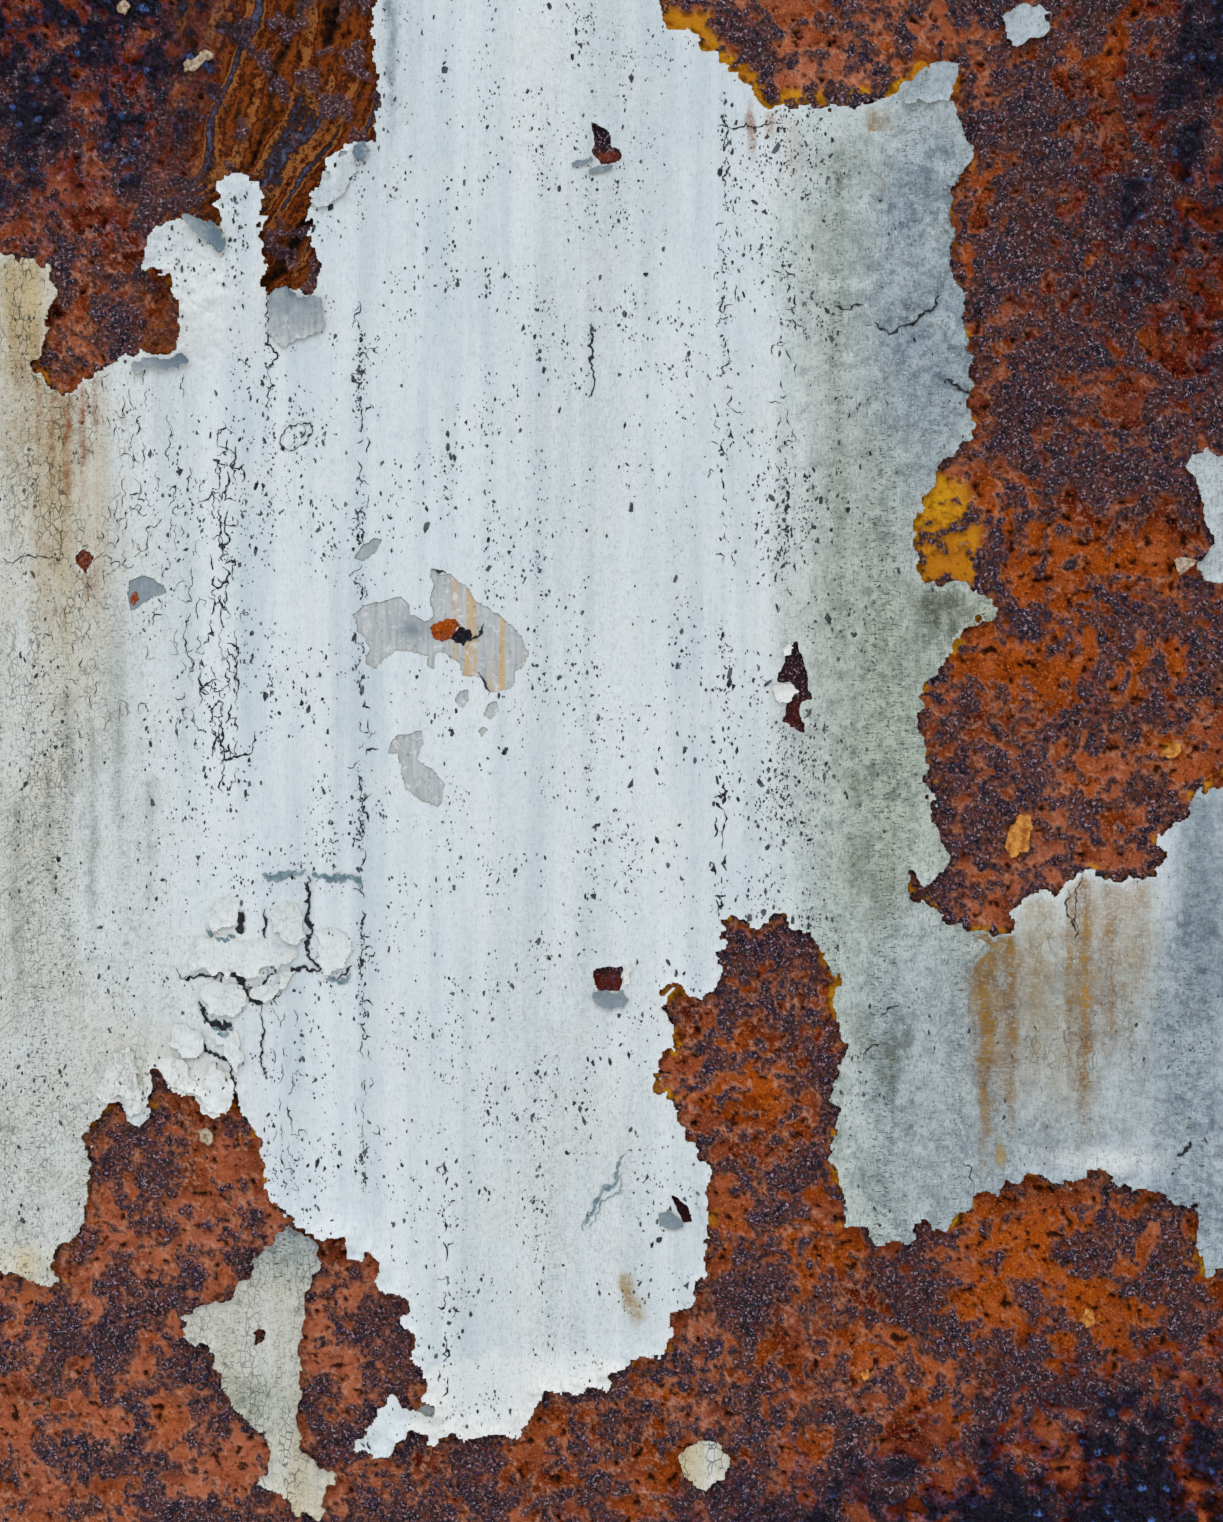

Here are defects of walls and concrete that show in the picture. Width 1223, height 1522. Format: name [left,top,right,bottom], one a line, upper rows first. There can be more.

peeling [0,0,382,396]
peeling [571,123,622,175]
peeling [76,550,94,574]
crack [2,370,257,791]
peeling [127,575,167,610]
peeling [353,569,529,737]
peeling [659,0,1223,937]
peeling [388,730,445,807]
corrosion [976,934,1016,1130]
corrosion [1066,880,1113,1082]
peeling [0,913,1223,1522]
corrosion [621,1277,640,1318]